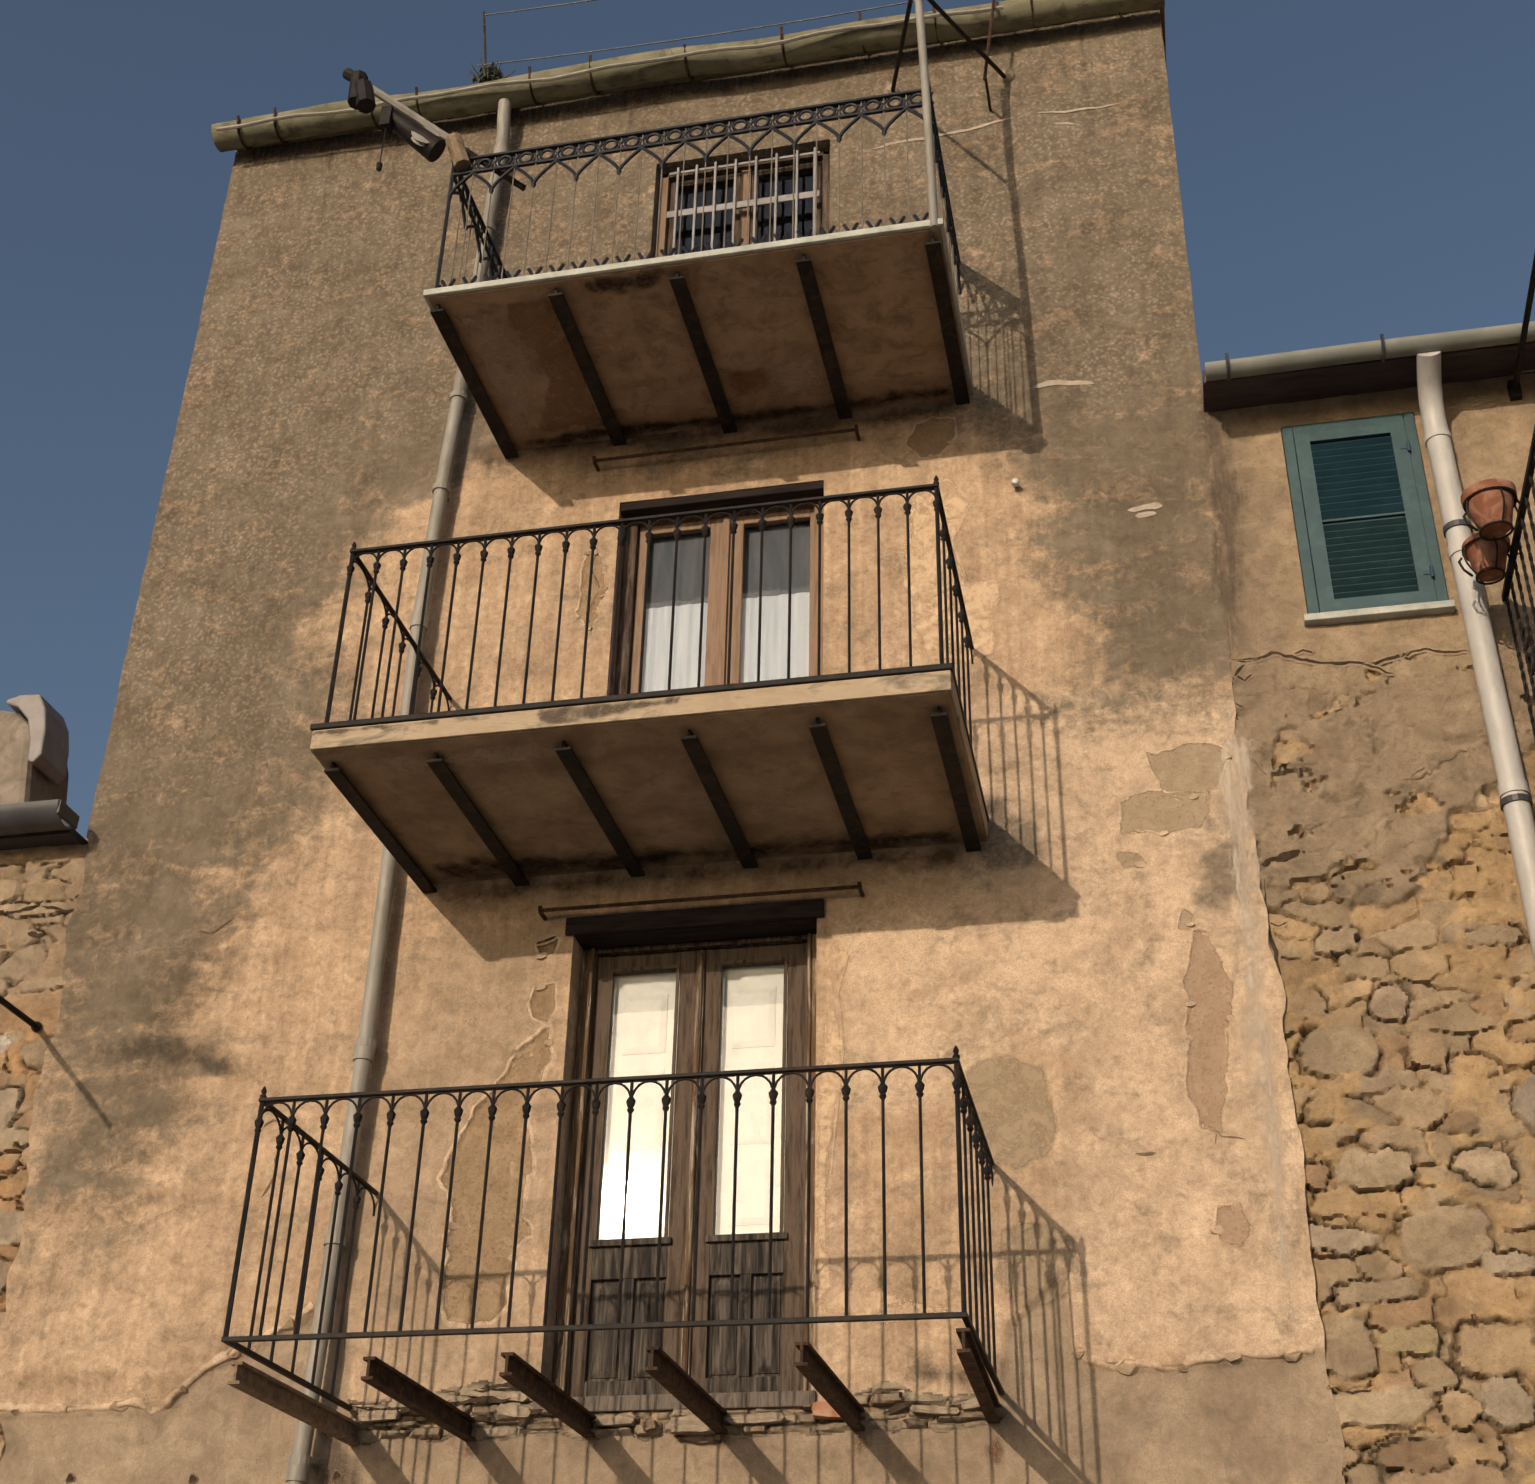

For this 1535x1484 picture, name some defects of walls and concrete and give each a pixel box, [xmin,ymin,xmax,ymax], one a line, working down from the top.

leakage [585,271,659,292]
leakage [461,299,949,451]
peeling [574,549,609,631]
crack [1230,646,1470,722]
peeling [1113,741,1232,870]
leakage [438,832,955,897]
spalling [535,937,561,959]
leakage [134,1038,226,1073]
spalling [1177,907,1237,1138]
spalling [436,981,558,1328]
peeling [0,1301,315,1416]